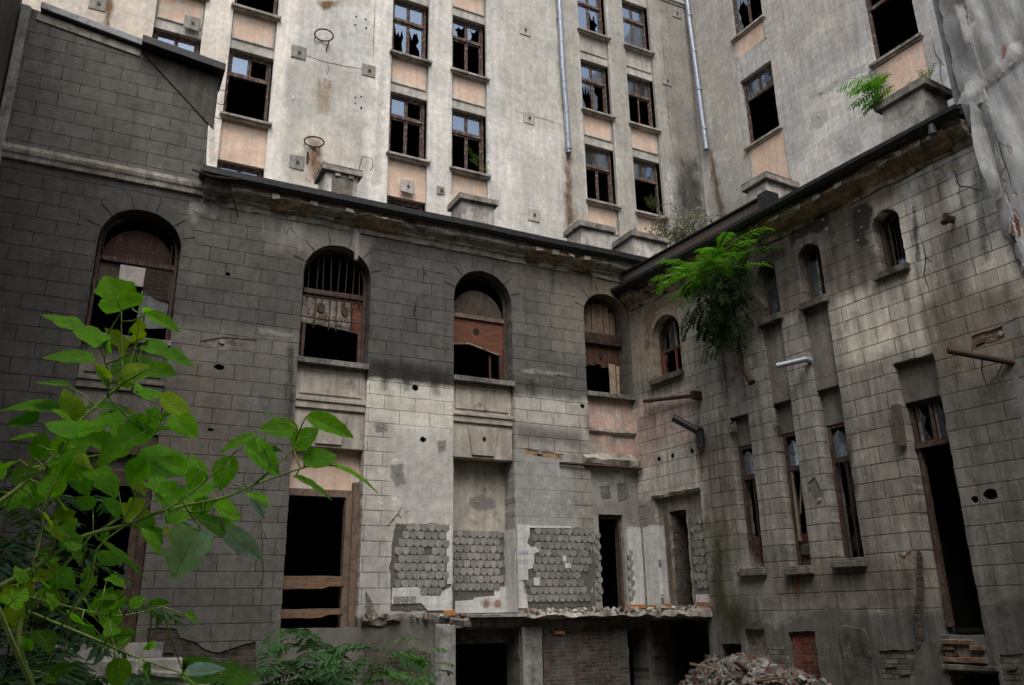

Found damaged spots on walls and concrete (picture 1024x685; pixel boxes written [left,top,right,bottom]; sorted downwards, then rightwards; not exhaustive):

crack [951,135,1020,205]
peeling [188,202,221,224]
spalling [256,192,318,218]
spalling [344,208,402,236]
spalling [1008,214,1021,239]
spalling [972,326,1004,350]
spalling [525,448,563,460]